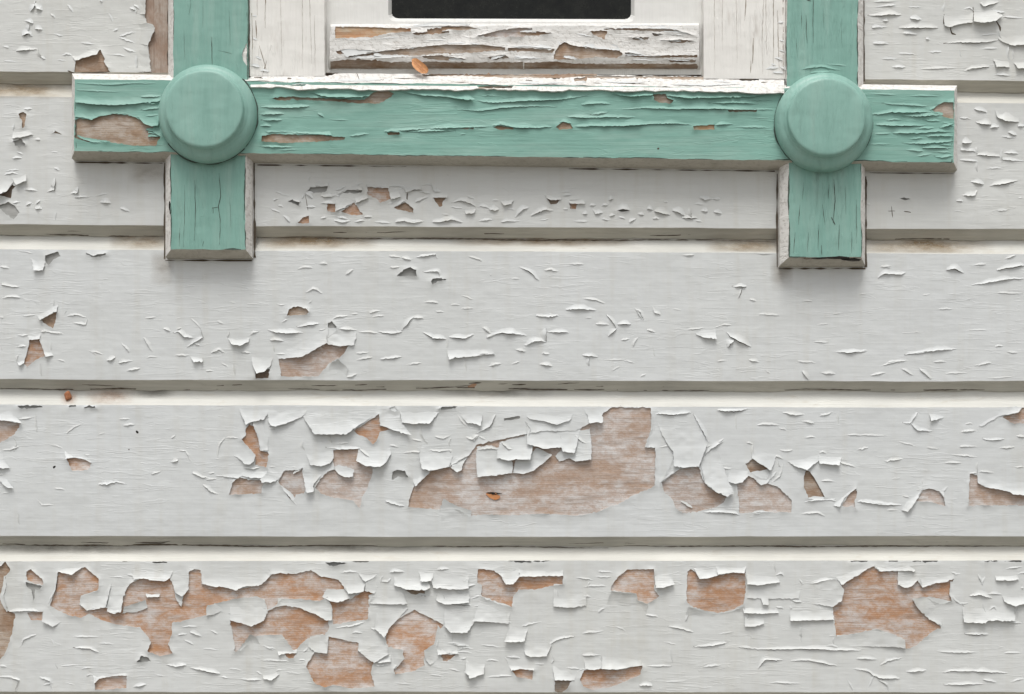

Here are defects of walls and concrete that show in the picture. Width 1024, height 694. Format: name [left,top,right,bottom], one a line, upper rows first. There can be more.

peeling [72,50,110,74]
peeling [74,94,161,146]
peeling [138,0,168,75]
peeling [273,25,708,104]
peeling [612,79,772,104]
peeling [17,305,58,367]
peeling [252,321,356,378]
peeling [216,405,841,521]
peeling [968,473,1024,506]
peeling [0,562,15,659]
peeling [26,561,642,692]
peeling [686,561,1024,649]